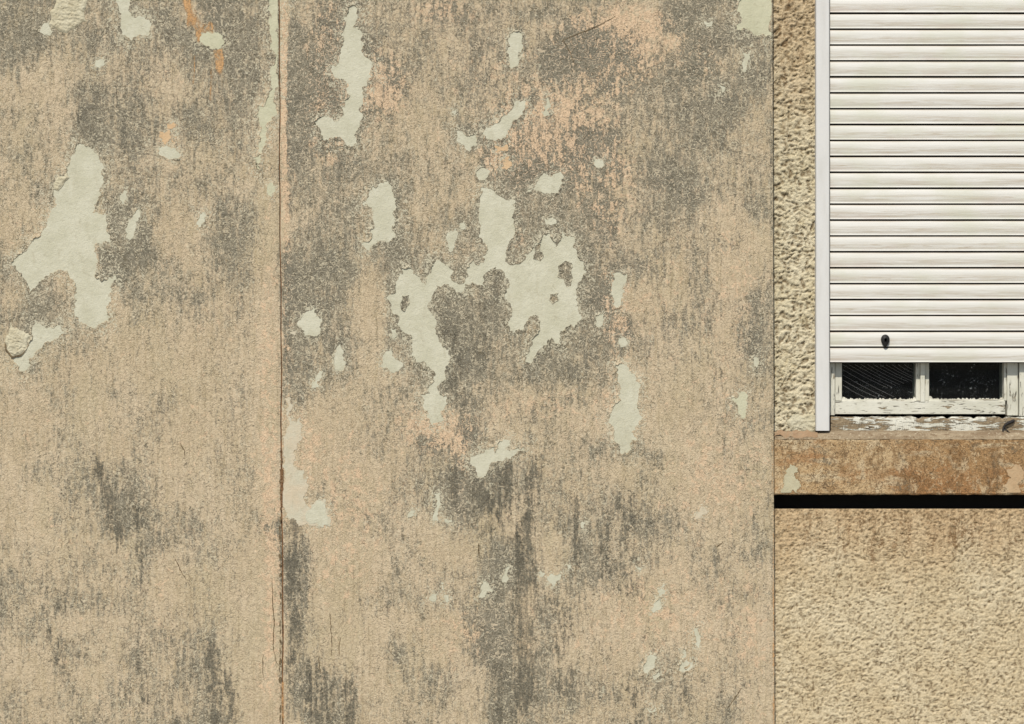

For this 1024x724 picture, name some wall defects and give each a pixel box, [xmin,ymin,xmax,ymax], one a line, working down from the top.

peeling [311,2,377,150]
peeling [733,0,772,74]
peeling [5,140,143,375]
peeling [358,178,401,254]
peeling [379,92,630,428]
water stain [96,458,123,548]
peeling [283,397,331,528]
peeling [466,436,527,481]
peeling [606,360,645,458]
water stain [472,464,541,721]